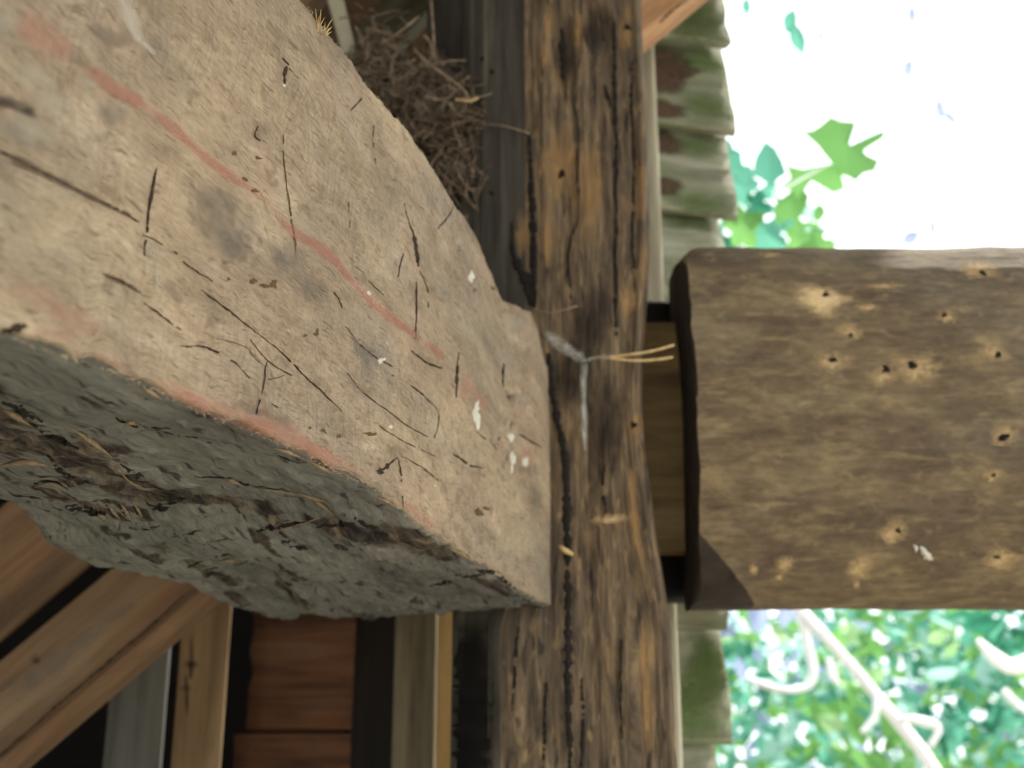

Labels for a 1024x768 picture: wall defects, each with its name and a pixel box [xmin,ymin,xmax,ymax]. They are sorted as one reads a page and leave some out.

crack [0,151,35,169]
crack [103,168,342,414]
crack [254,126,297,251]
crack [334,203,497,508]
crack [499,363,507,387]
crack [509,135,538,308]